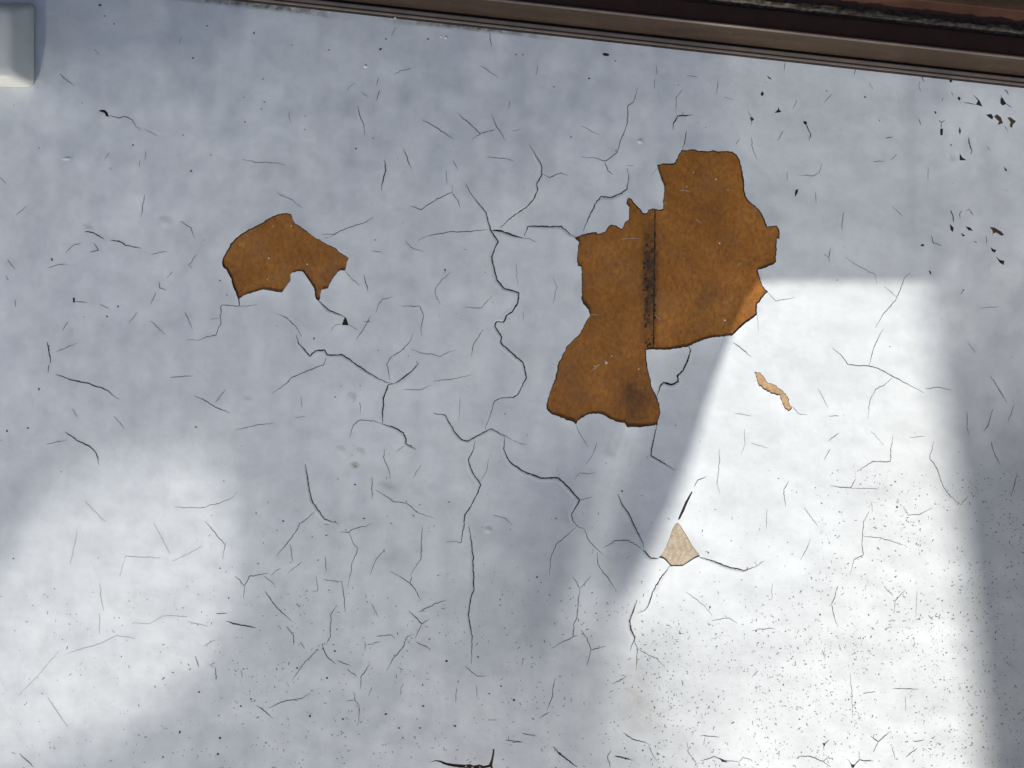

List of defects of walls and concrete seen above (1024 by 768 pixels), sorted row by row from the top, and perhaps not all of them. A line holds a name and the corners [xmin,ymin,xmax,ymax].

peeling [219,213,348,300]
peeling [546,149,780,427]
crack [26,67,766,722]
peeling [755,372,792,411]
crack [824,248,967,624]
crack [967,377,1018,495]
peeling [659,491,699,566]
crack [507,680,577,767]
crack [607,733,656,765]
crack [687,735,748,764]
crack [798,732,922,766]